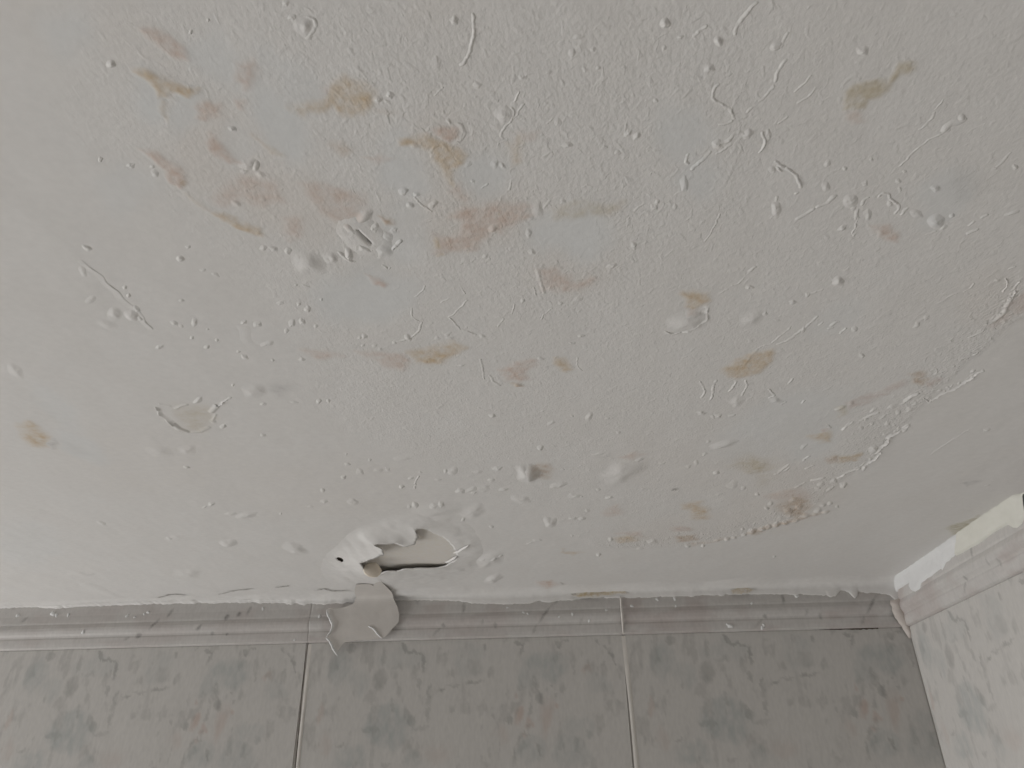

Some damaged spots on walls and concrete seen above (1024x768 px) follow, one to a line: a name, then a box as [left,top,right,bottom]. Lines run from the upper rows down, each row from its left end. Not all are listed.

water stain [832,57,921,151]
water stain [127,52,404,246]
water stain [321,122,472,187]
peeling [323,211,403,270]
water stain [427,195,631,259]
water stain [294,337,471,374]
water stain [716,346,779,382]
peeling [799,369,985,492]
peeling [326,529,457,656]